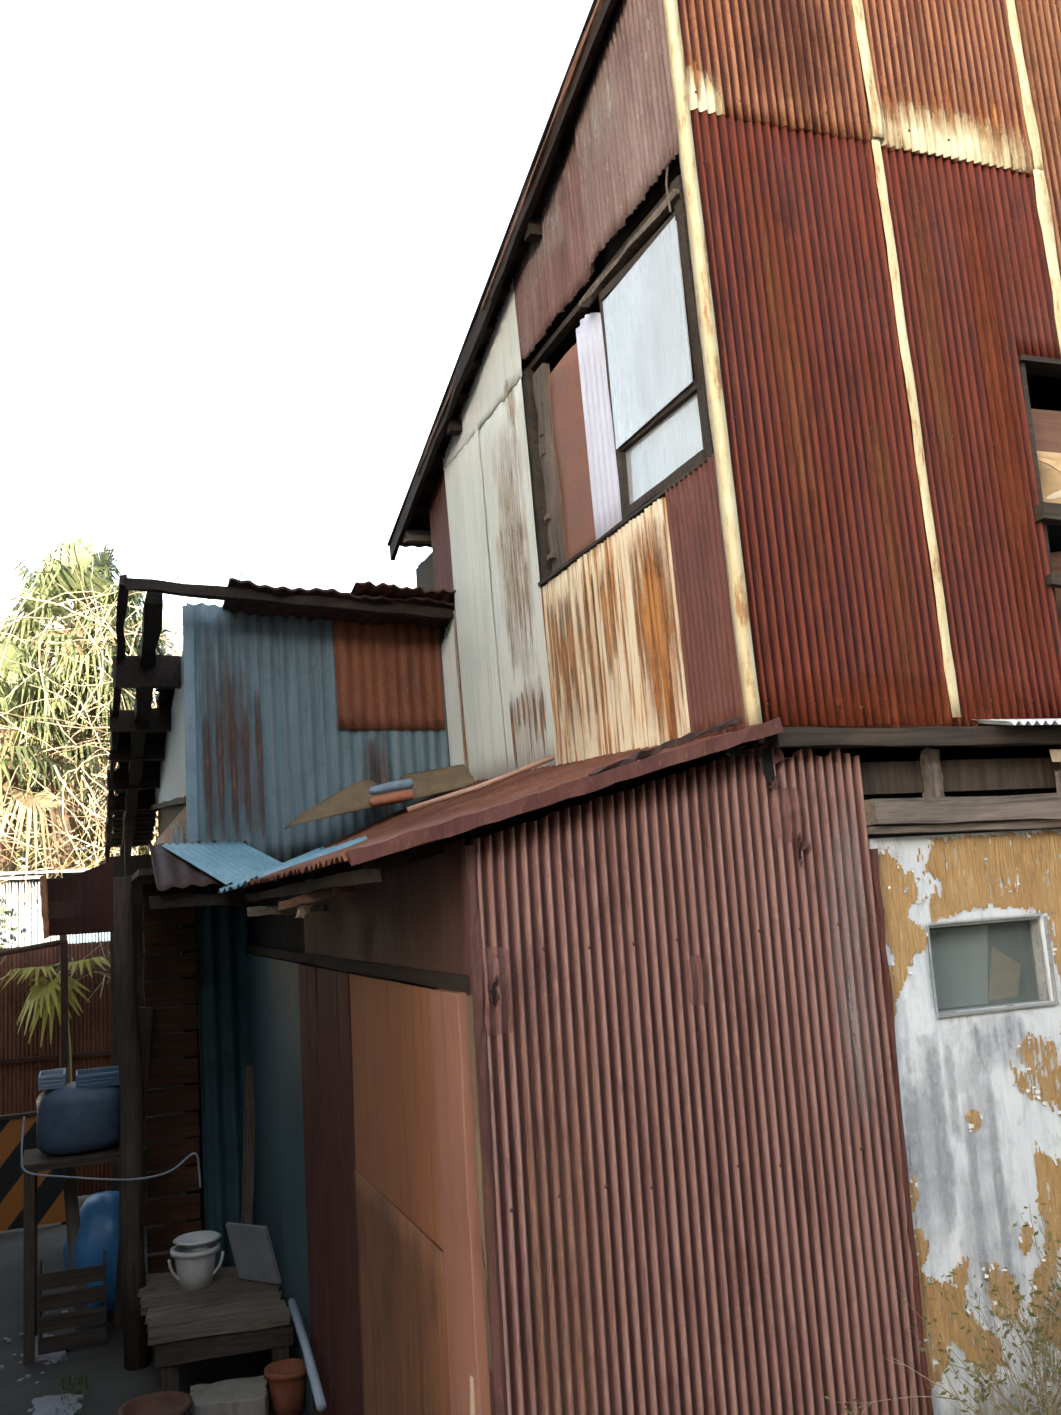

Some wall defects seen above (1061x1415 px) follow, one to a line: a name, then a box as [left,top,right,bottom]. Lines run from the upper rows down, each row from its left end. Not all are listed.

rust [970,224,1029,553]
rust [510,531,682,763]
rust [834,684,993,728]
peeling [878,830,1061,1021]
peeling [965,1109,983,1132]
peeling [1010,1027,1061,1116]
peeling [909,1140,1061,1392]